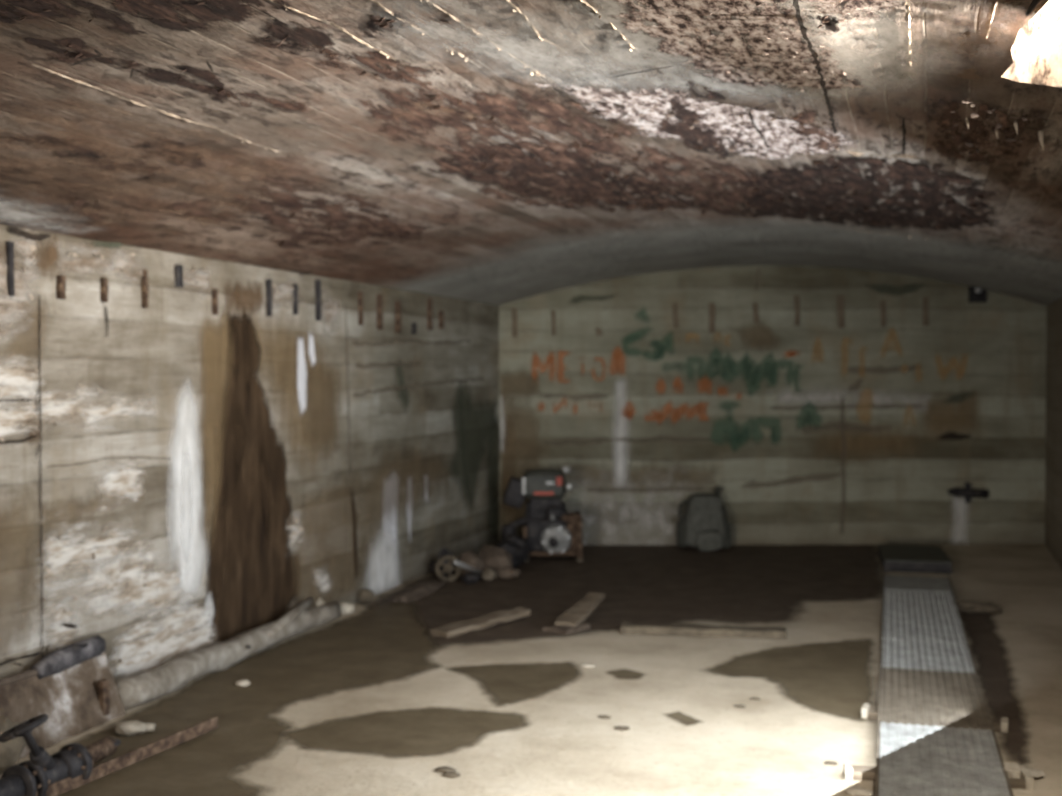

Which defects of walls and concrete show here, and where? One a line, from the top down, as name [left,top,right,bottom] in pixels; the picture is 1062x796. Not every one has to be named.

spalling [0,0,1048,249]
damp [172,312,333,643]
damp [452,386,503,539]
damp [616,384,626,486]
damp [59,474,884,796]